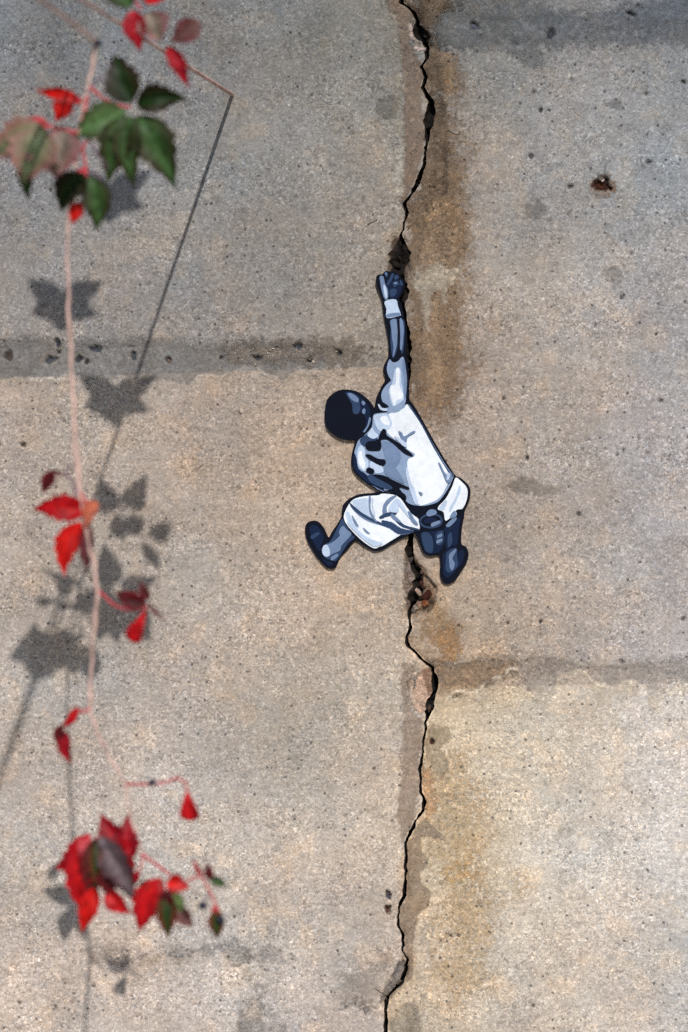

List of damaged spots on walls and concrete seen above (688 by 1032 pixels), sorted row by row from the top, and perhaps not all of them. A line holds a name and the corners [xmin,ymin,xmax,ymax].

water stain [378,0,424,201]
crack [388,0,460,380]
corrosion [590,175,616,197]
water stain [414,261,459,329]
crack [374,533,439,1032]